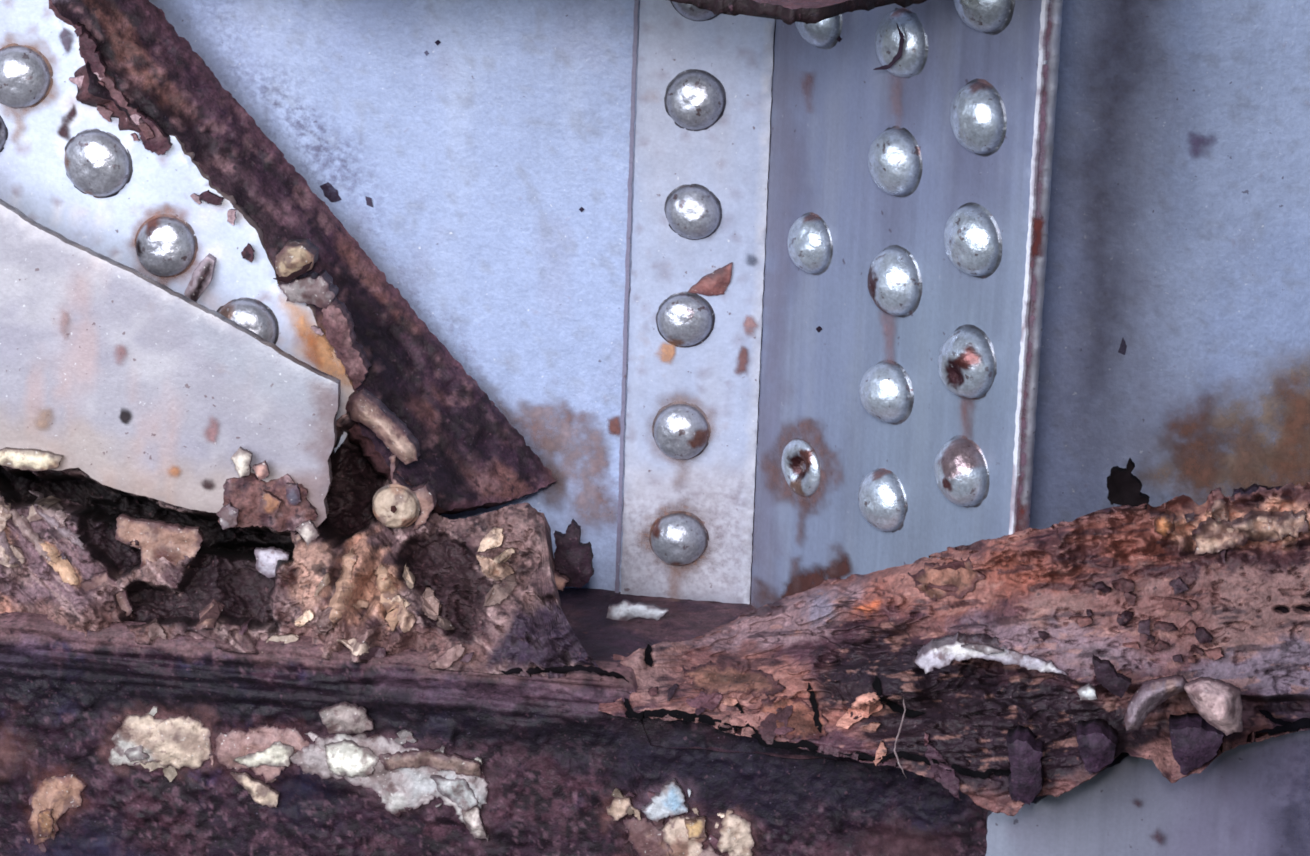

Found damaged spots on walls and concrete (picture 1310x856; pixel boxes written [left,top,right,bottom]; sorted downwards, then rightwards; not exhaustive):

rust [58,22,172,155]
rust [273,238,437,531]
peeling [0,447,63,471]
rust [202,446,320,546]
rust [26,767,88,852]
peeling [254,546,290,578]
peeling [99,701,493,841]
peeling [262,548,465,669]
rust [622,807,754,856]
crack [499,644,1011,779]
peeling [915,631,1068,676]
rust [1076,655,1243,775]